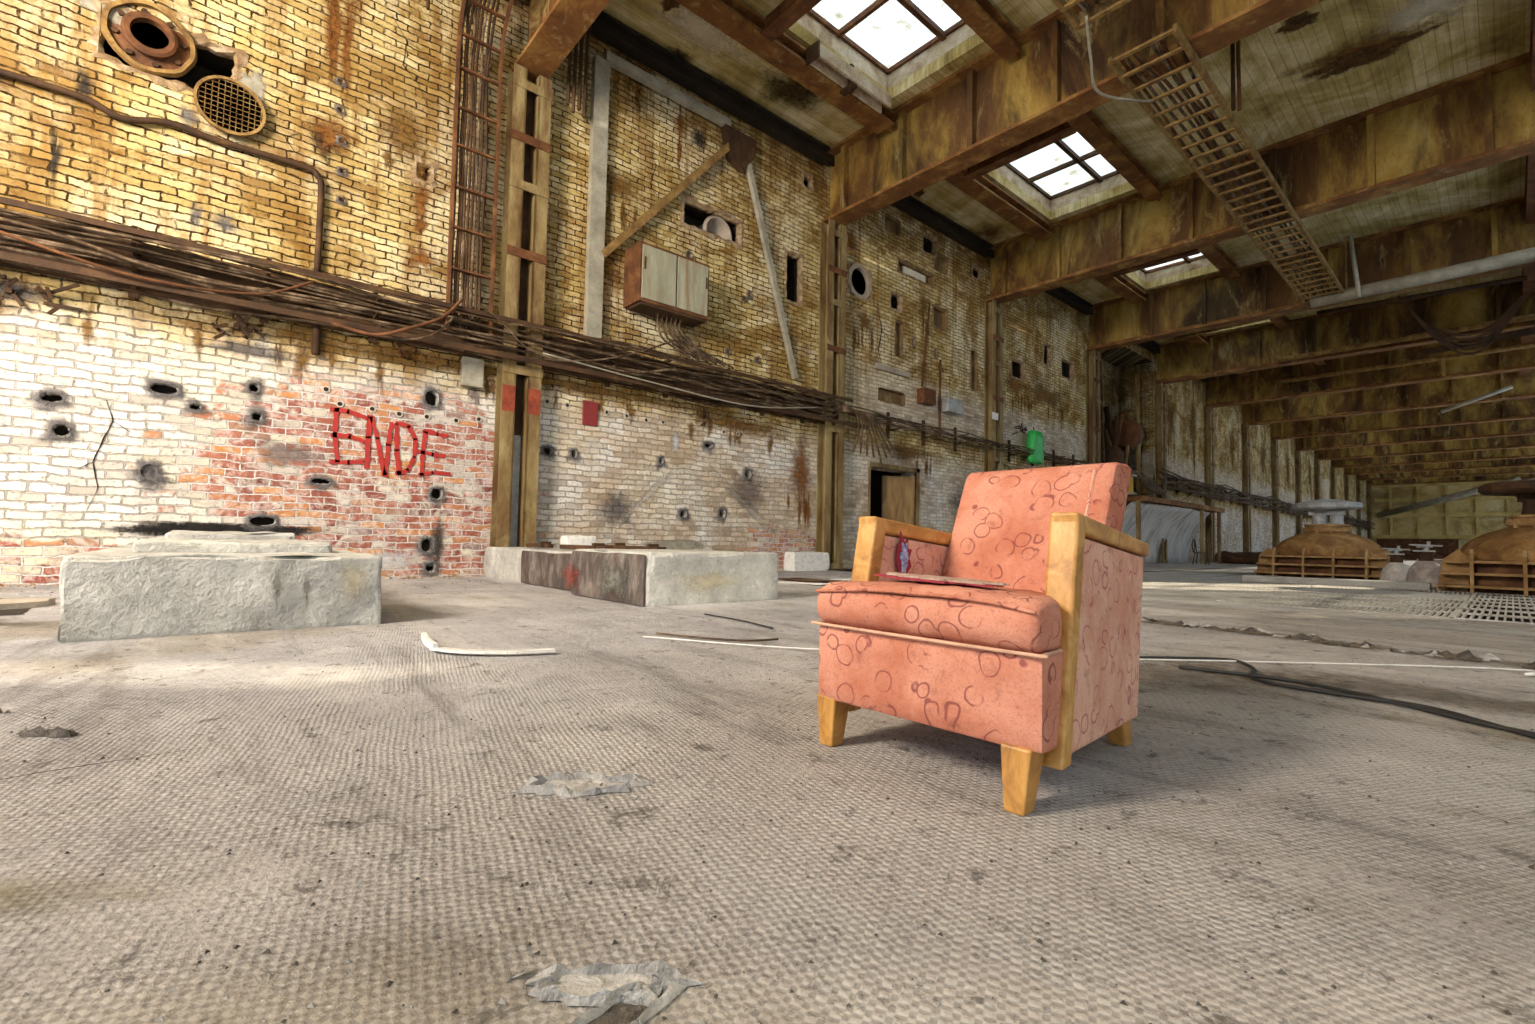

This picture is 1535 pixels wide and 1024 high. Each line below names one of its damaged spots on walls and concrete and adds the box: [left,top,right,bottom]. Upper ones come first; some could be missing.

rust [325,0,360,87]
rust [309,119,356,161]
rust [787,437,811,525]
spalling [498,959,707,1024]